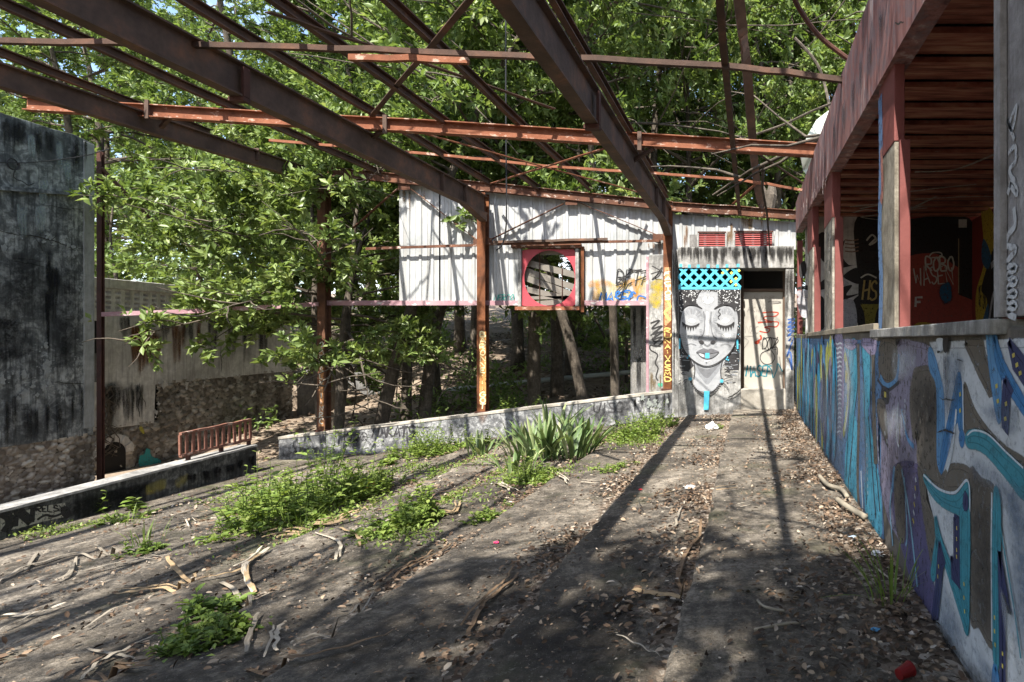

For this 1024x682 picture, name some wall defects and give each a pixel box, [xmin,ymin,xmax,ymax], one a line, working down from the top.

water stain [0,253,75,359]